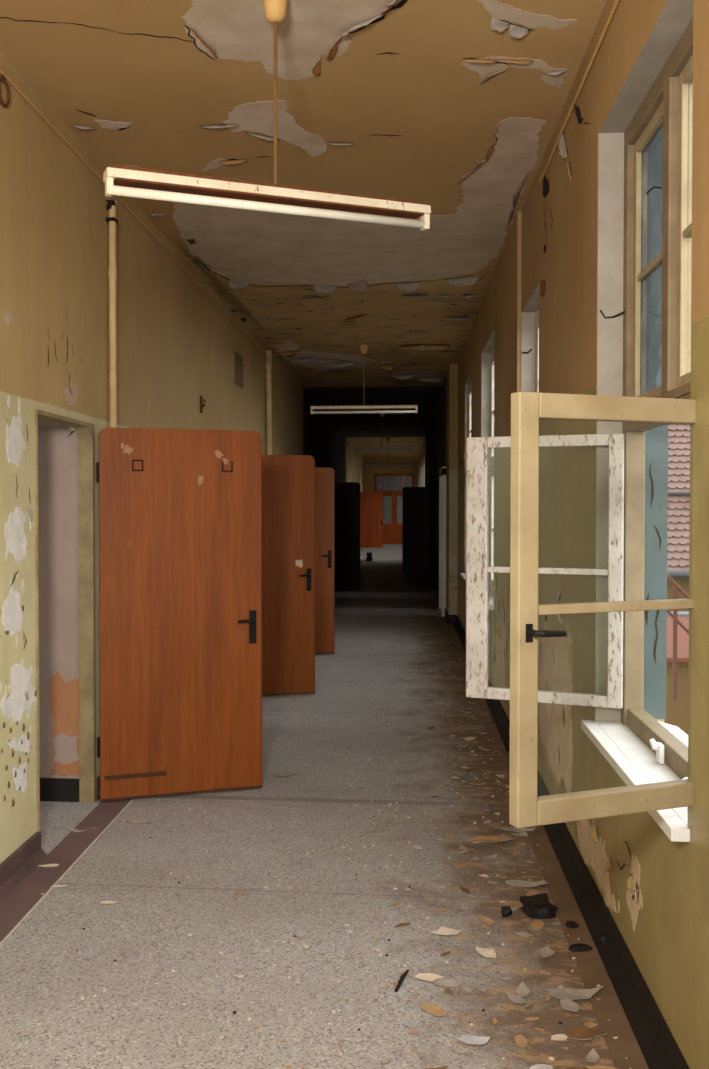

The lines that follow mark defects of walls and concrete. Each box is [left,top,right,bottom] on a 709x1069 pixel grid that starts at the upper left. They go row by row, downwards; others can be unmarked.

crack [0,17,194,42]
peeling [182,0,407,80]
peeling [462,57,568,88]
peeling [477,0,578,38]
peeling [199,100,353,157]
peeling [150,117,549,299]
peeling [268,333,442,382]
spalling [0,396,36,807]
spalling [49,671,79,777]
peeling [538,587,575,793]
spalling [576,819,643,930]